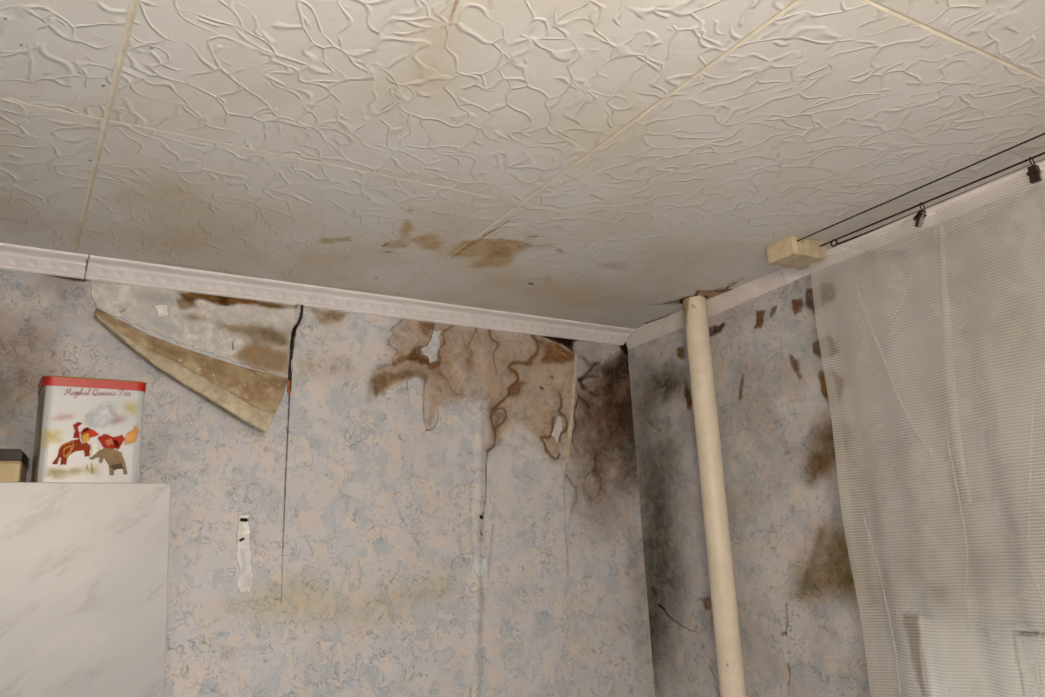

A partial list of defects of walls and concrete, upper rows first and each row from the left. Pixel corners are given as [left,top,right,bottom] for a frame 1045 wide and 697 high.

damp [452,223,536,267]
flaking render [89,282,301,378]
damp [809,422,848,482]
damp [373,319,680,666]
damp [800,531,864,596]